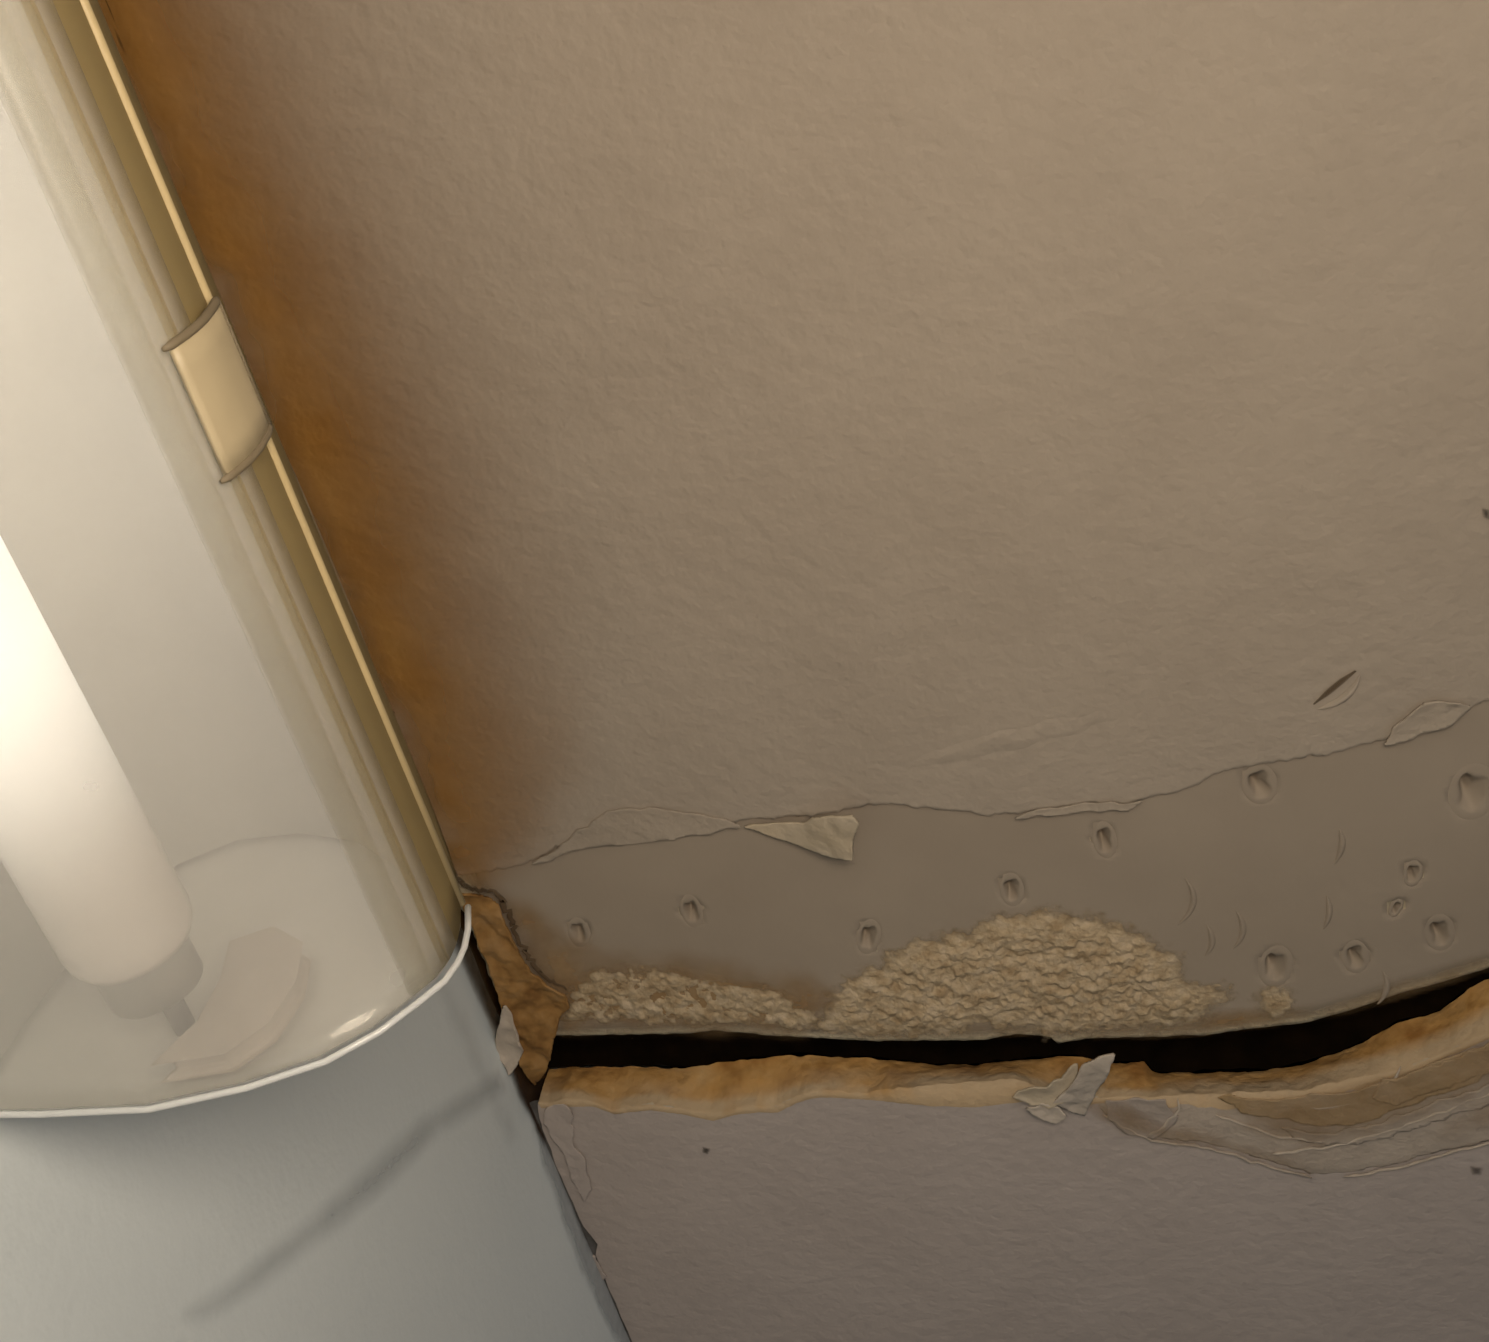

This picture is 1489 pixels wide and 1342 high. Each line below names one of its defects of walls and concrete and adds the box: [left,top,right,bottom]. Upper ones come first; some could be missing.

spalling [1242,764,1278,804]
spalling [1448,763,1489,820]
peeling [745,815,859,861]
spalling [1090,821,1117,858]
leakage [457,926,500,1028]
crack [456,872,567,1015]
spalling [462,873,1489,1179]
leakage [513,1064,552,1139]
crack [529,968,1489,1342]